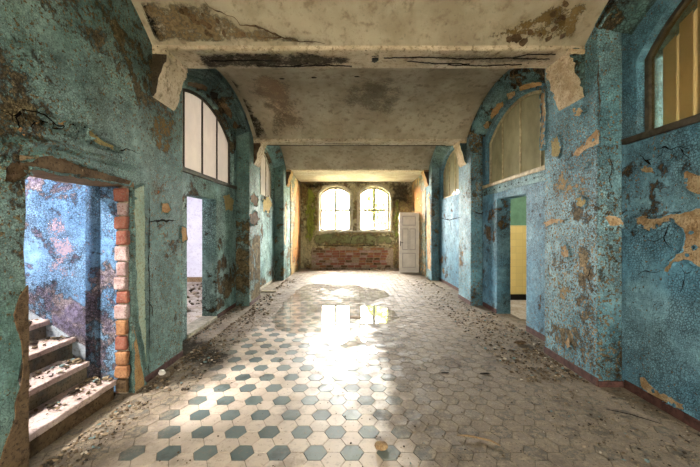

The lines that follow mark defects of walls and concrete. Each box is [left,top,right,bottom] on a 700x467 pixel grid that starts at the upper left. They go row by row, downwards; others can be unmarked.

crack [205,2,325,44]
peeling [506,0,569,47]
leakage [200,53,348,69]
crack [384,54,556,67]
crack [1,109,86,140]
peeling [85,125,123,154]
peeling [483,82,601,210]
leakage [305,183,409,245]
flaking render [0,153,172,393]
peeling [603,206,700,273]
crack [639,224,672,274]
spalling [0,285,32,467]